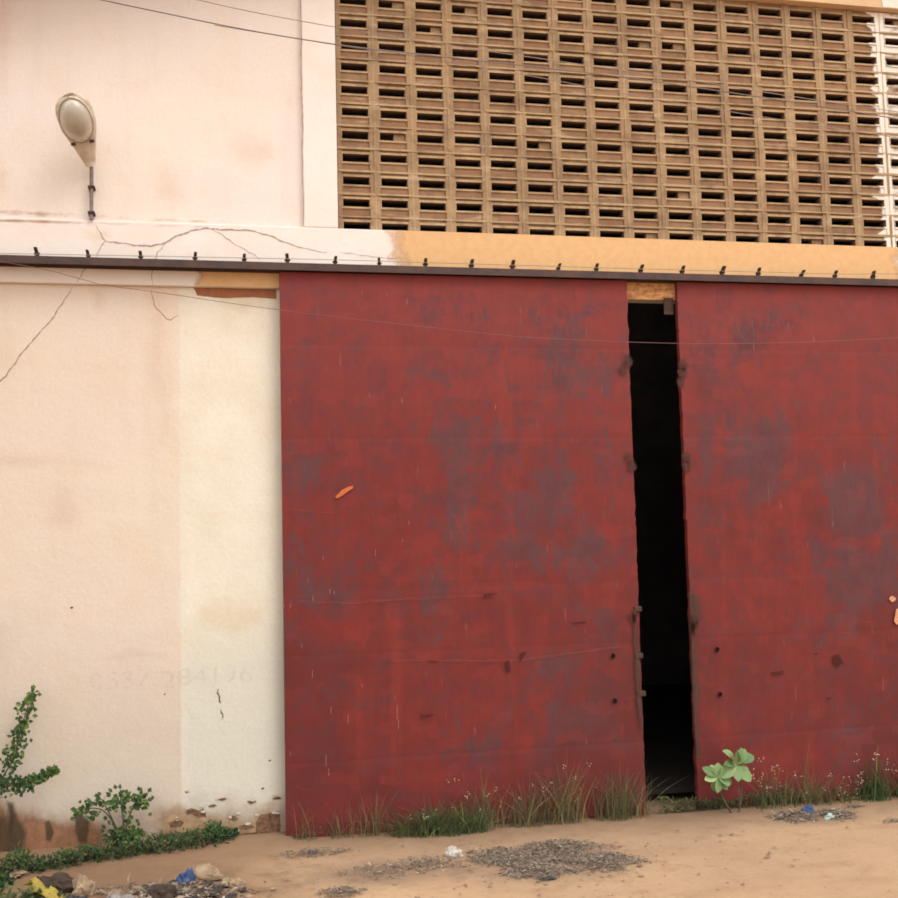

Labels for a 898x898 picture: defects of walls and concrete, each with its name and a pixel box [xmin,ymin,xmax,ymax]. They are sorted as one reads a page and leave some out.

corrosion [629,610,642,728]
corrosion [689,592,701,759]
damp [0,803,25,852]
damp [157,812,258,840]
peeling [168,798,281,840]